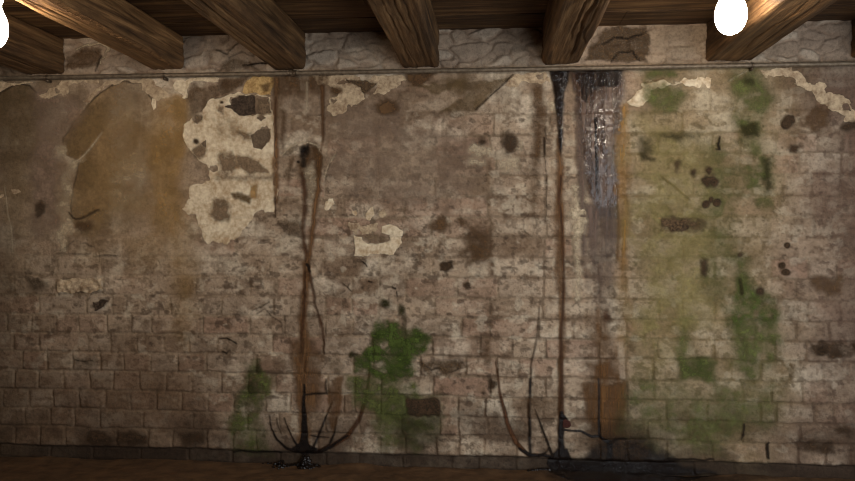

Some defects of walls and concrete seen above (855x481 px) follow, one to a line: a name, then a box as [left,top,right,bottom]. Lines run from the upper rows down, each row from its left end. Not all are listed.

flaking render [0,80,33,92]
flaking render [310,74,407,116]
flaking render [761,67,855,131]
flaking render [39,42,279,251]
flaking render [348,207,403,257]
water stain [533,70,624,415]
water stain [691,167,721,208]
corrosion [292,154,325,442]
crack [233,363,371,455]
water stain [402,397,441,435]
crack [495,326,627,470]
water stain [550,362,716,476]